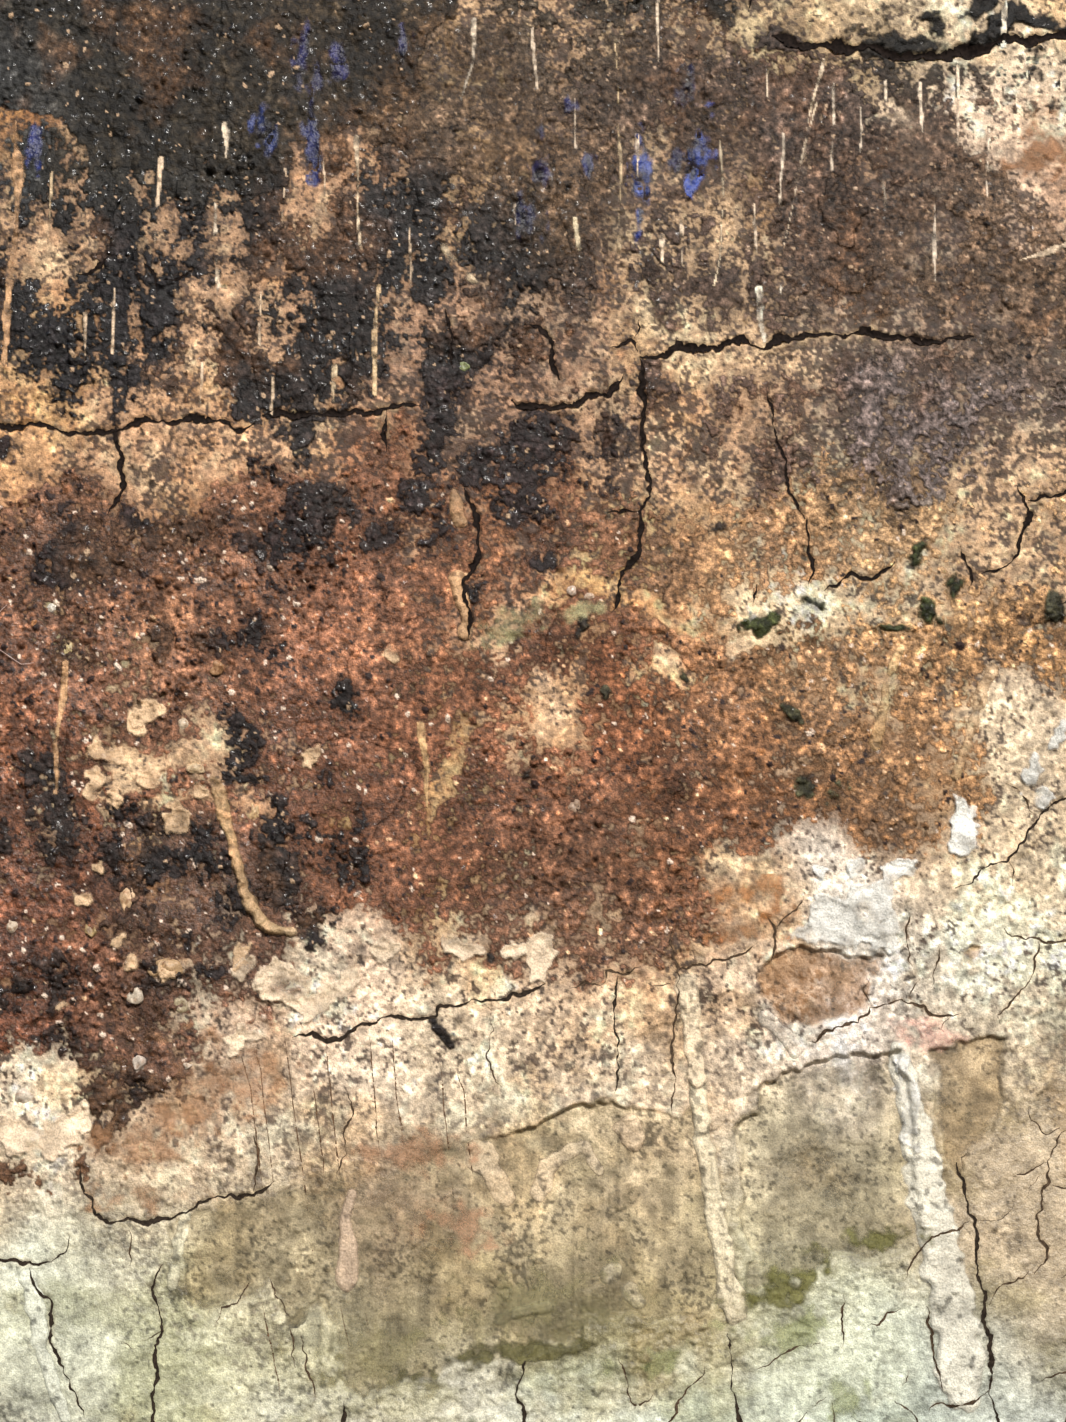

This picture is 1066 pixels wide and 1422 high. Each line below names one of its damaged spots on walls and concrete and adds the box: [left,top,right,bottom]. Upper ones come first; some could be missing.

crack [748,0,1066,62]
damp [0,0,1066,598]
crack [511,320,974,612]
damp [736,611,781,639]
damp [880,570,965,631]
corrosion [0,407,1066,1092]
damp [428,1015,455,1049]
crack [292,898,804,1111]
spalling [758,858,918,1024]
spalling [963,945,981,959]
crack [0,1136,274,1422]
crack [618,1108,1066,1422]